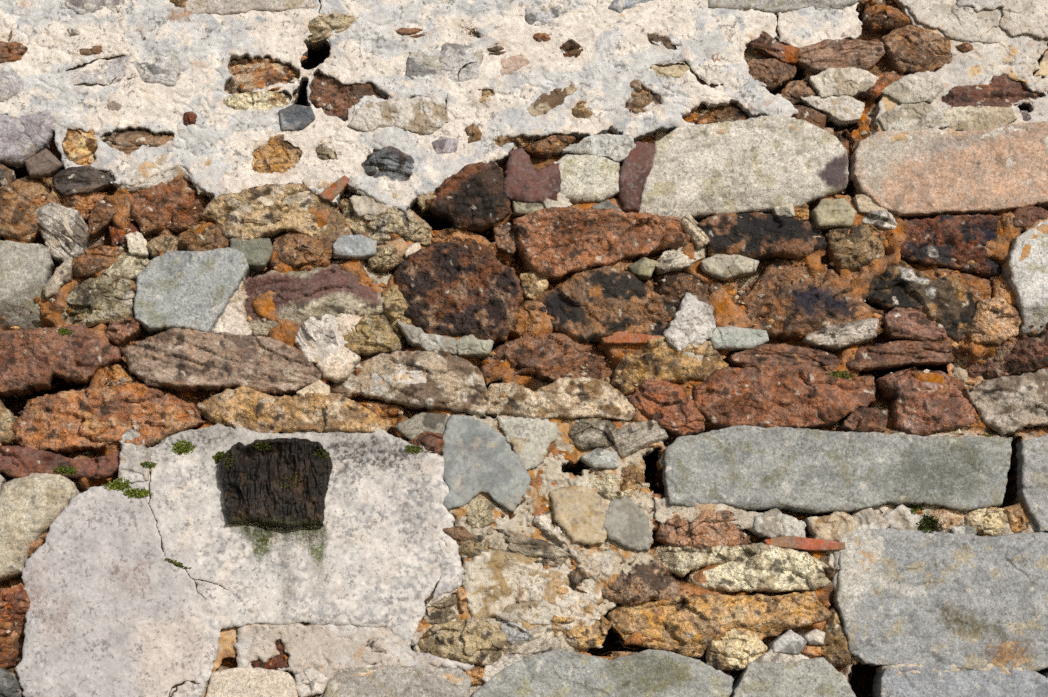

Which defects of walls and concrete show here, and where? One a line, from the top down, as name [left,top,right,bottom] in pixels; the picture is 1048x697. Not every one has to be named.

spalling [302,44,328,70]
flaking render [905,0,1048,78]
spalling [183,111,197,126]
spalling [279,82,315,131]
spalling [571,100,593,119]
spalling [432,123,482,154]
spalling [125,232,150,260]
spalling [42,256,73,299]
spalling [628,257,657,281]
spalling [0,381,89,417]
crack [148,467,228,599]
damp [240,521,326,560]